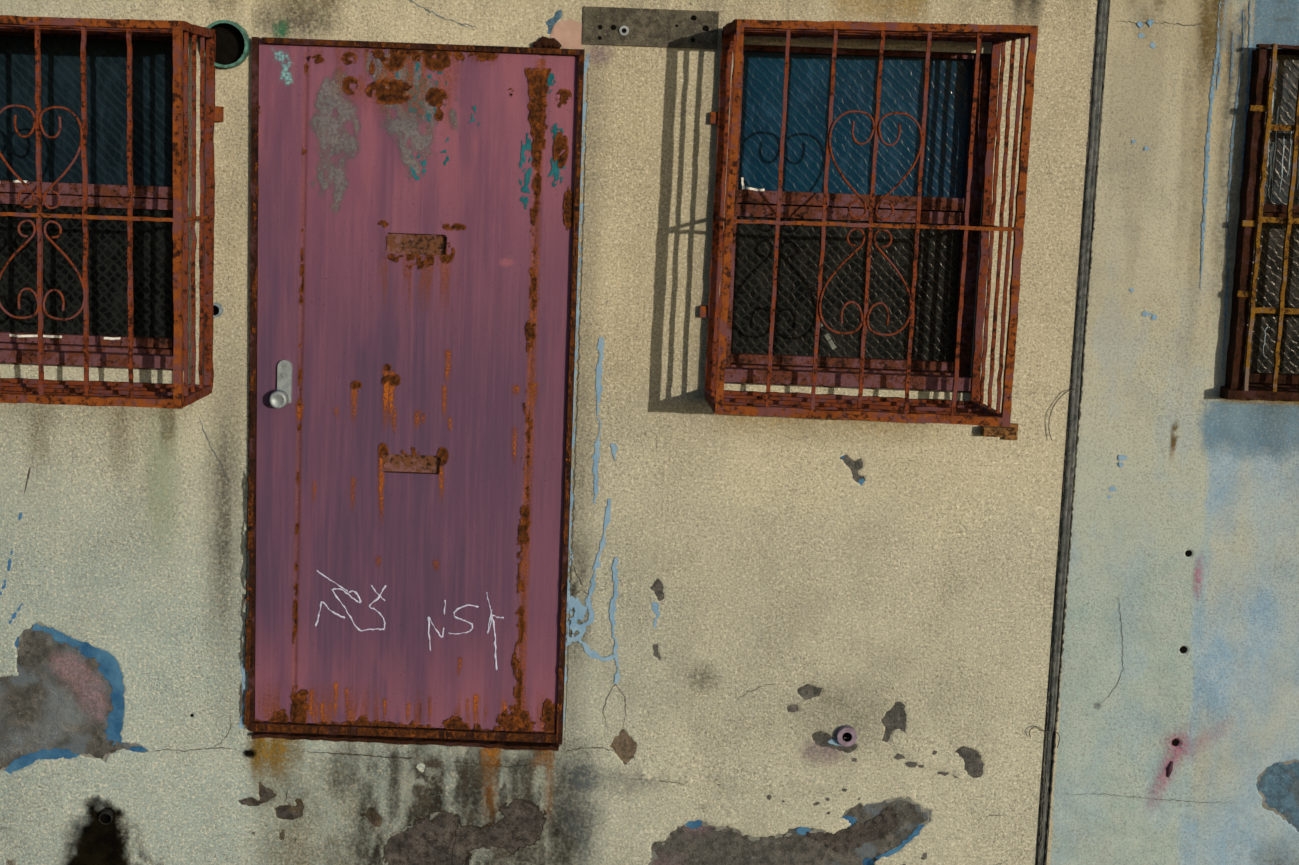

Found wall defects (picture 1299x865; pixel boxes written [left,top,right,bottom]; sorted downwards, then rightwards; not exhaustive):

corrosion [245,38,584,770]
spalling [0,622,148,774]
leakage [66,798,142,865]
spalling [360,799,547,865]
leakage [357,745,599,865]
spalling [648,789,931,865]
spalling [1256,759,1299,832]